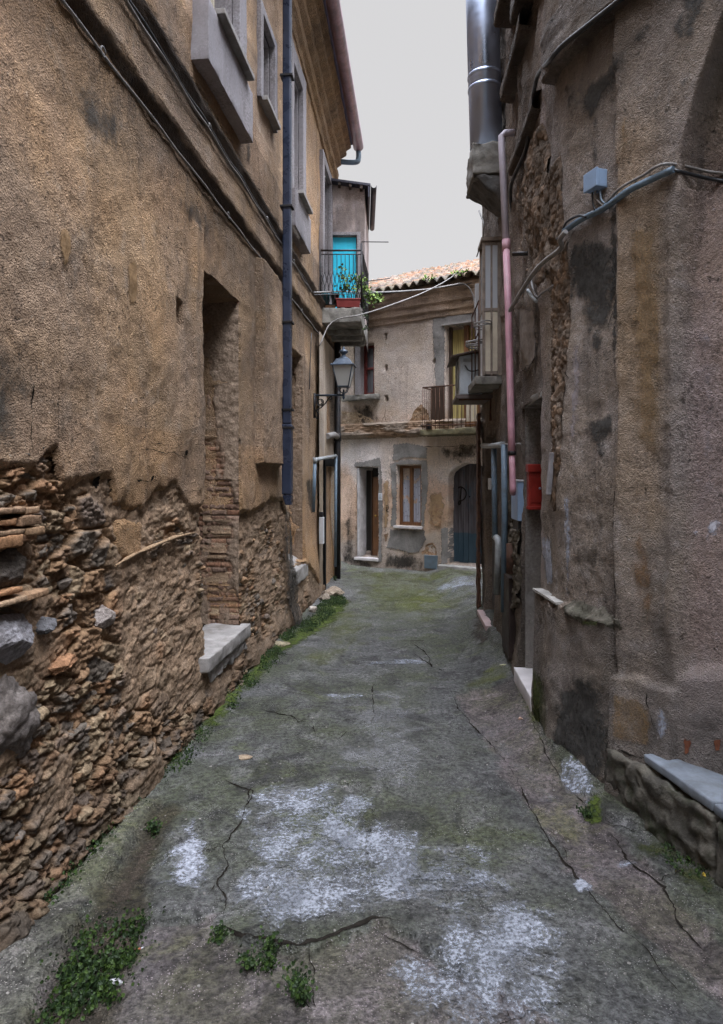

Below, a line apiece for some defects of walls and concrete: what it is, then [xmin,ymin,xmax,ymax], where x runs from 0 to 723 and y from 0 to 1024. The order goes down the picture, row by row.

flaking render [516,123,571,511]
flaking render [0,447,326,952]
damp [553,679,606,793]
damp [168,826,205,887]
crack [176,780,416,1005]
damp [238,784,564,1024]
crack [455,697,712,1019]